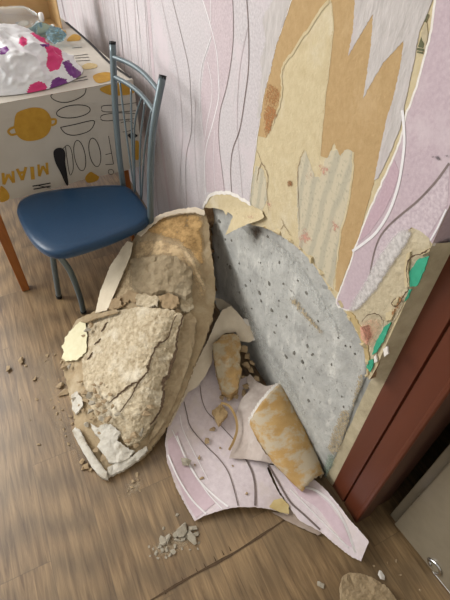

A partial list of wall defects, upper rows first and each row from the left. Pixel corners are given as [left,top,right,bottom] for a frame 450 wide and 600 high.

rust [264,85,279,133]
spalling [202,190,432,478]